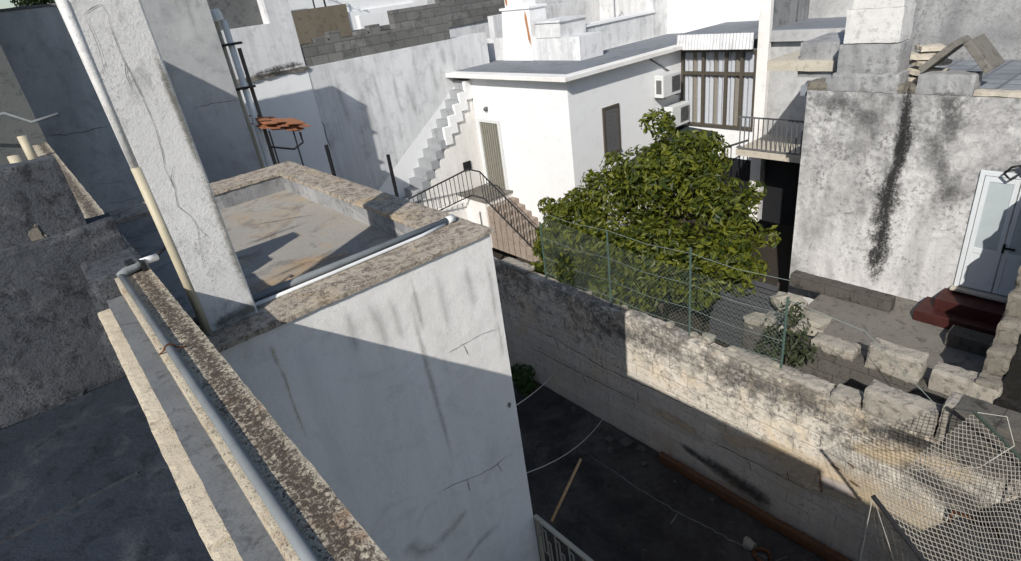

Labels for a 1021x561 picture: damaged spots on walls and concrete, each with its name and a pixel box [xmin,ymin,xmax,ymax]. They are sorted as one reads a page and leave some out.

crack [84,4,207,268]
leakage [868,83,912,277]
leakage [216,304,255,327]
crack [527,326,819,496]
leakage [682,445,770,505]